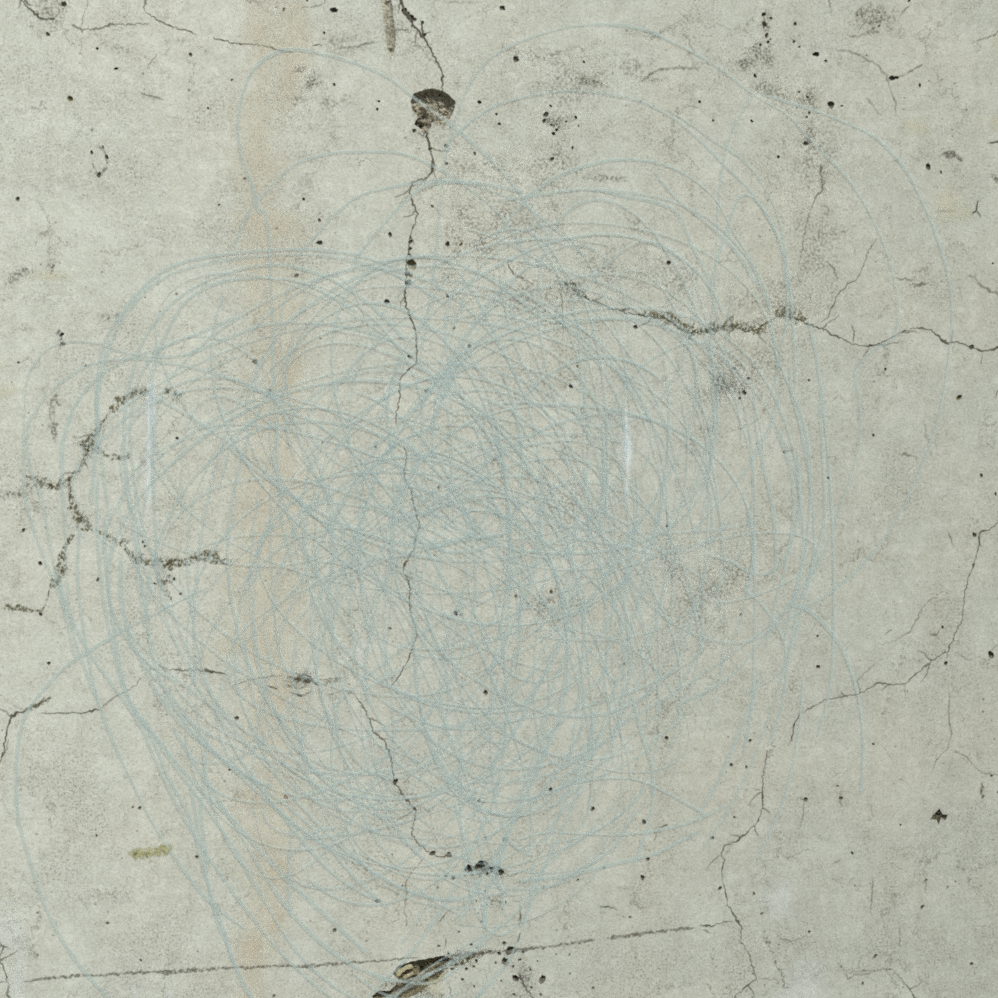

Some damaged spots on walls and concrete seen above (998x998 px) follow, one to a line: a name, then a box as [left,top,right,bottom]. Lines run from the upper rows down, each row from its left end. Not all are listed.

spalling [410,88,456,135]
crack [801,163,829,255]
crack [558,242,998,368]
crack [392,130,448,685]
crack [0,387,227,613]
crack [790,516,998,742]
crack [0,680,139,761]
crack [163,667,449,927]
crack [932,693,998,798]
crack [441,740,806,998]
crack [0,943,417,998]
spalling [372,941,524,998]